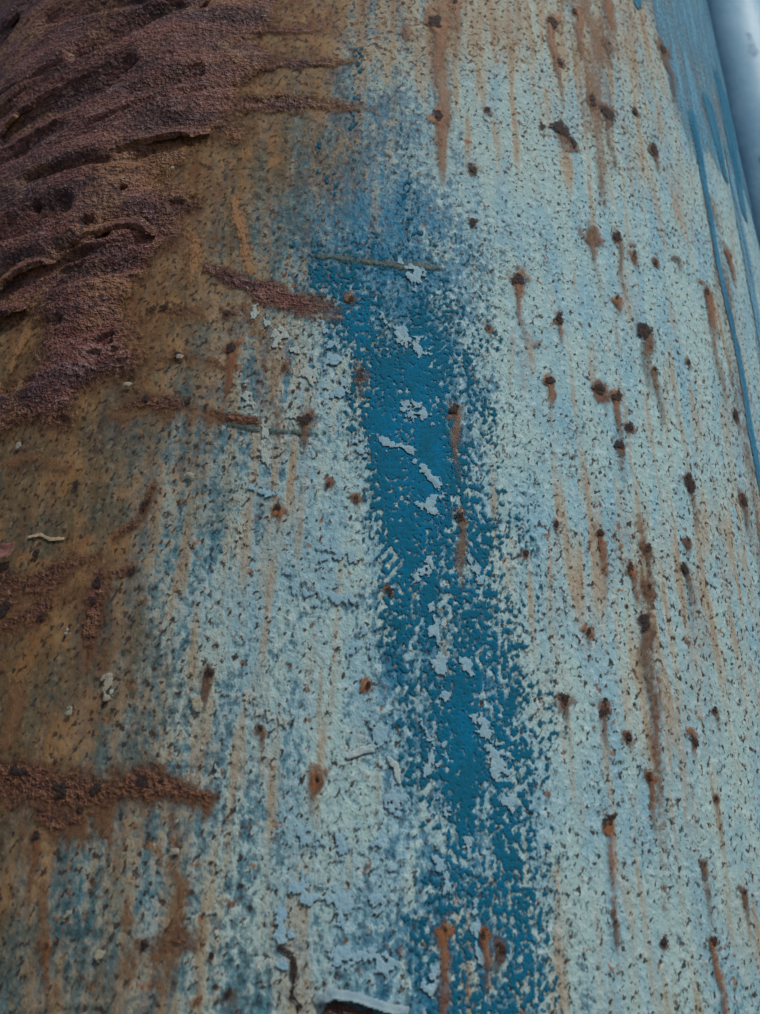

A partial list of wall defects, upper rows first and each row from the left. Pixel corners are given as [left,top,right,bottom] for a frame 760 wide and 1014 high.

rust [539,118,581,152]
rust [568,0,617,206]
rust [0,0,342,434]
rust [579,226,637,272]
peeling [235,373,274,468]
peeling [242,482,278,498]
rust [593,379,637,465]
rust [638,322,664,411]
peeling [250,123,581,1014]
rust [625,514,665,828]
rust [0,754,216,1011]
rust [603,812,620,948]